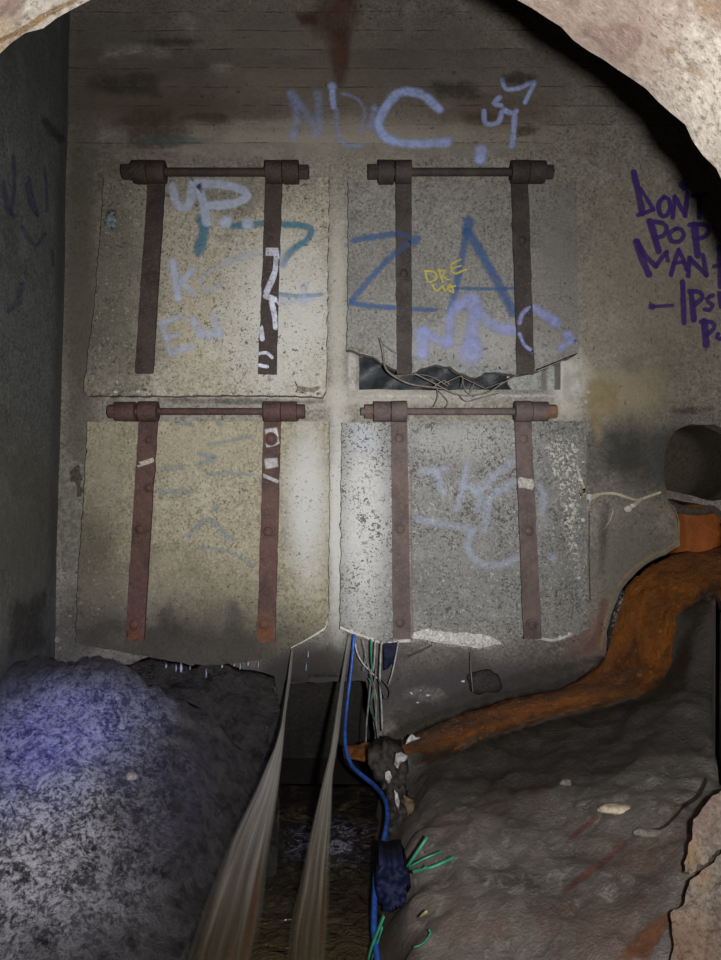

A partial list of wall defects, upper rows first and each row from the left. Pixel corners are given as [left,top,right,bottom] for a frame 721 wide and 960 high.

peeling [348,347,472,398]
spalling [423,359,507,375]
peeling [486,359,590,412]
spalling [340,627,502,648]